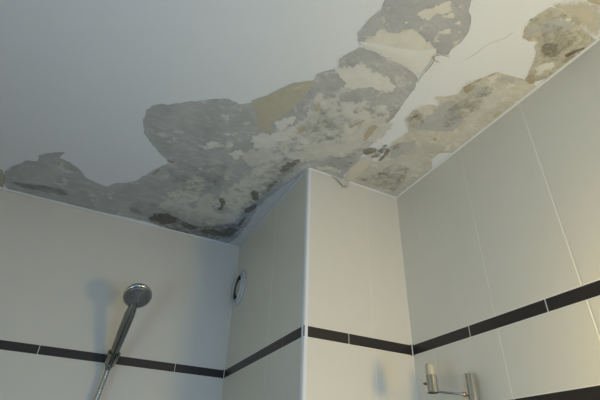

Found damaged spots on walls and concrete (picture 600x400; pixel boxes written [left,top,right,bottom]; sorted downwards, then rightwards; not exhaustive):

leakage [541,43,584,58]
peeling [3,0,596,243]
leakage [150,191,259,239]